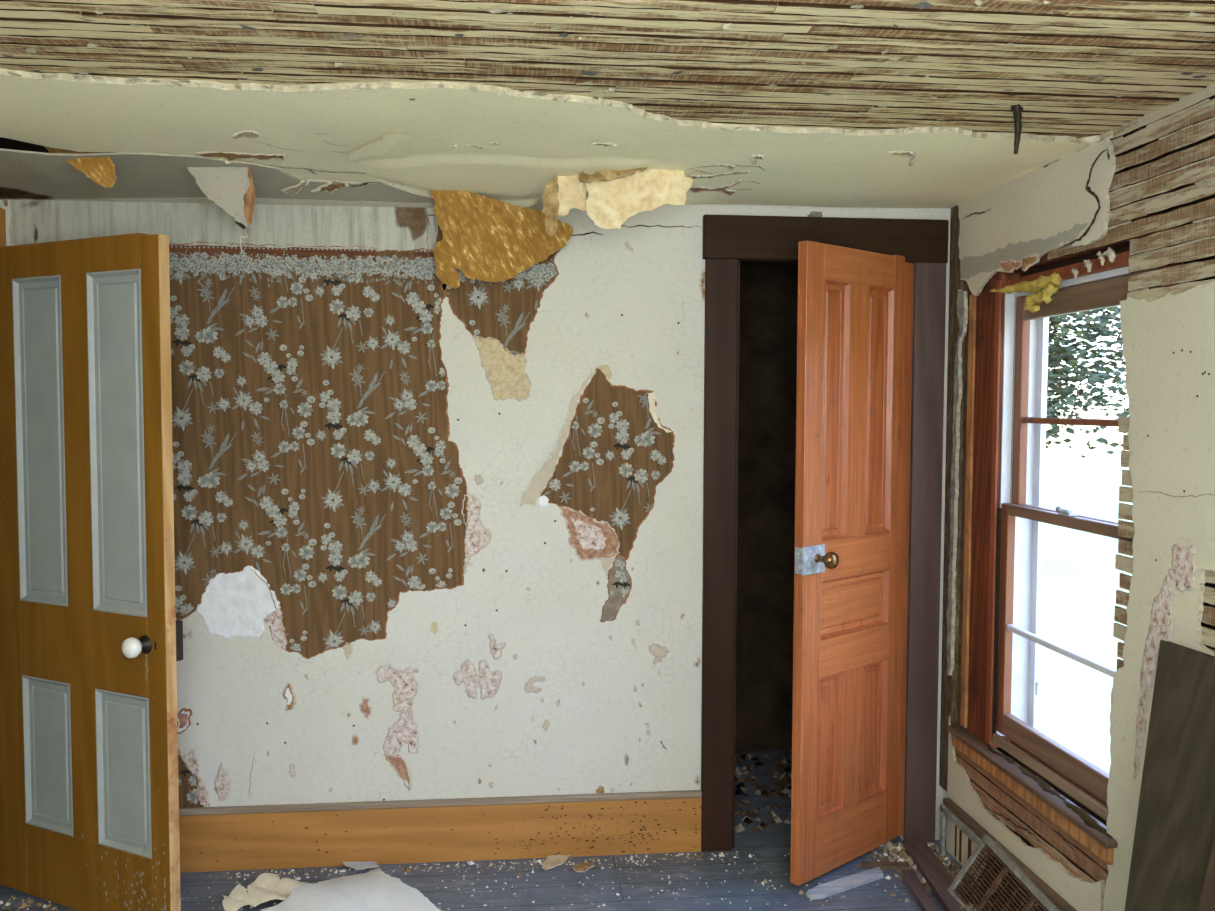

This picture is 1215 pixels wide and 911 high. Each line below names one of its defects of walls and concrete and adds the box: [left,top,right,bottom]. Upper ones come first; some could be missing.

crack [1063,148,1110,246]
peeling [472,335,531,401]
flaking render [461,493,492,574]
flaking render [559,506,620,577]
flaking render [196,566,280,640]
flaking render [453,634,507,700]
flaking render [631,638,669,665]
peeling [1132,543,1197,779]
flaking render [375,664,420,791]